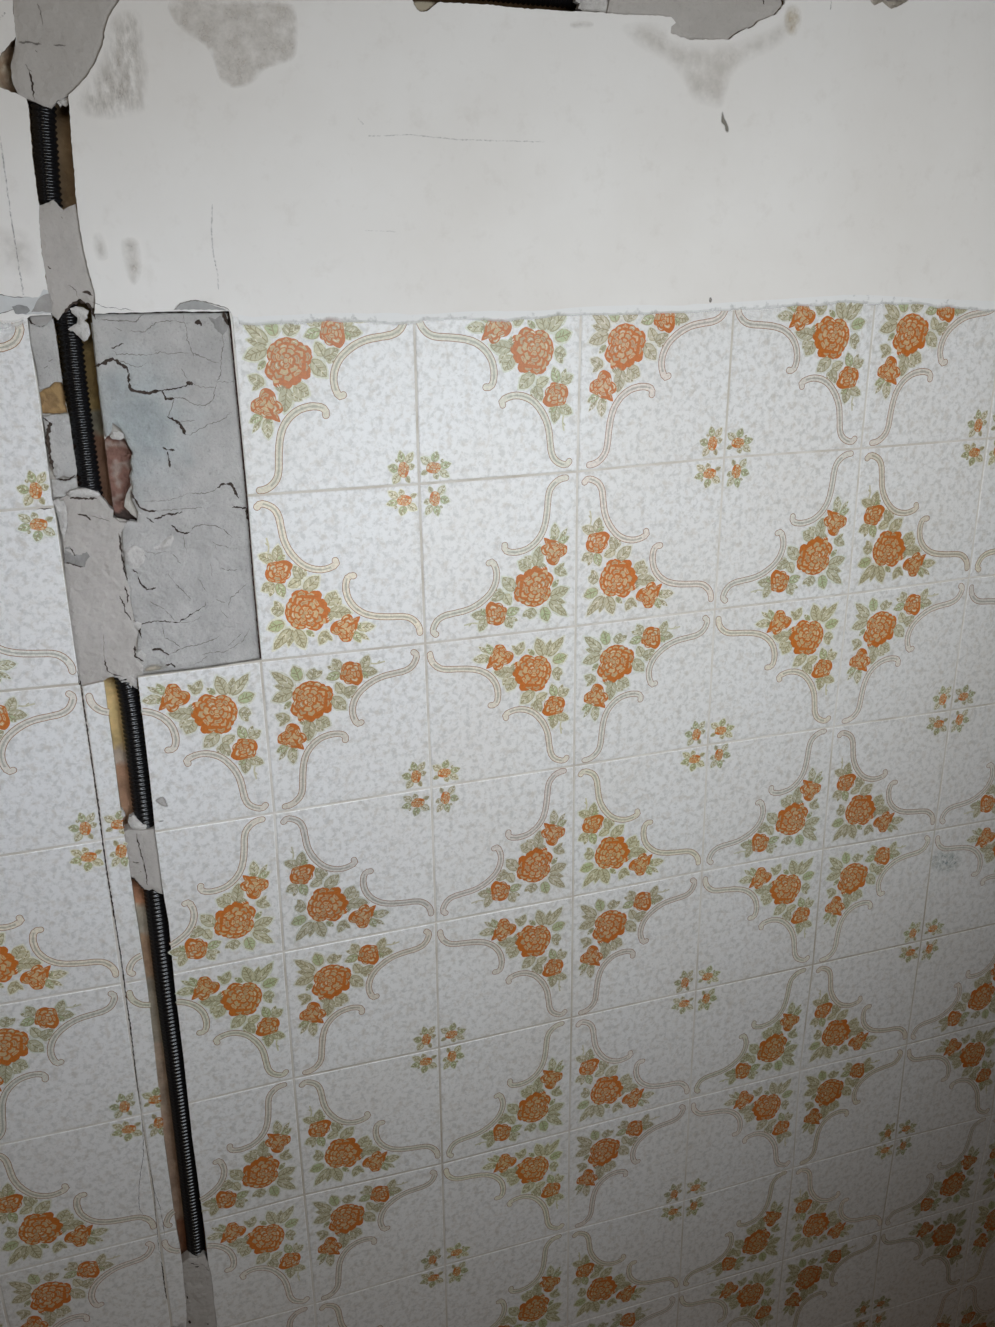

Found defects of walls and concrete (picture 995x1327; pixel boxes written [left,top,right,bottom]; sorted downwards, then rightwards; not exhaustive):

peeling [414,2,434,11]
spalling [0,38,18,94]
peeling [174,300,229,334]
spalling [40,382,67,414]
spalling [105,436,137,521]
spalling [64,546,90,567]
crack [29,285,248,1299]